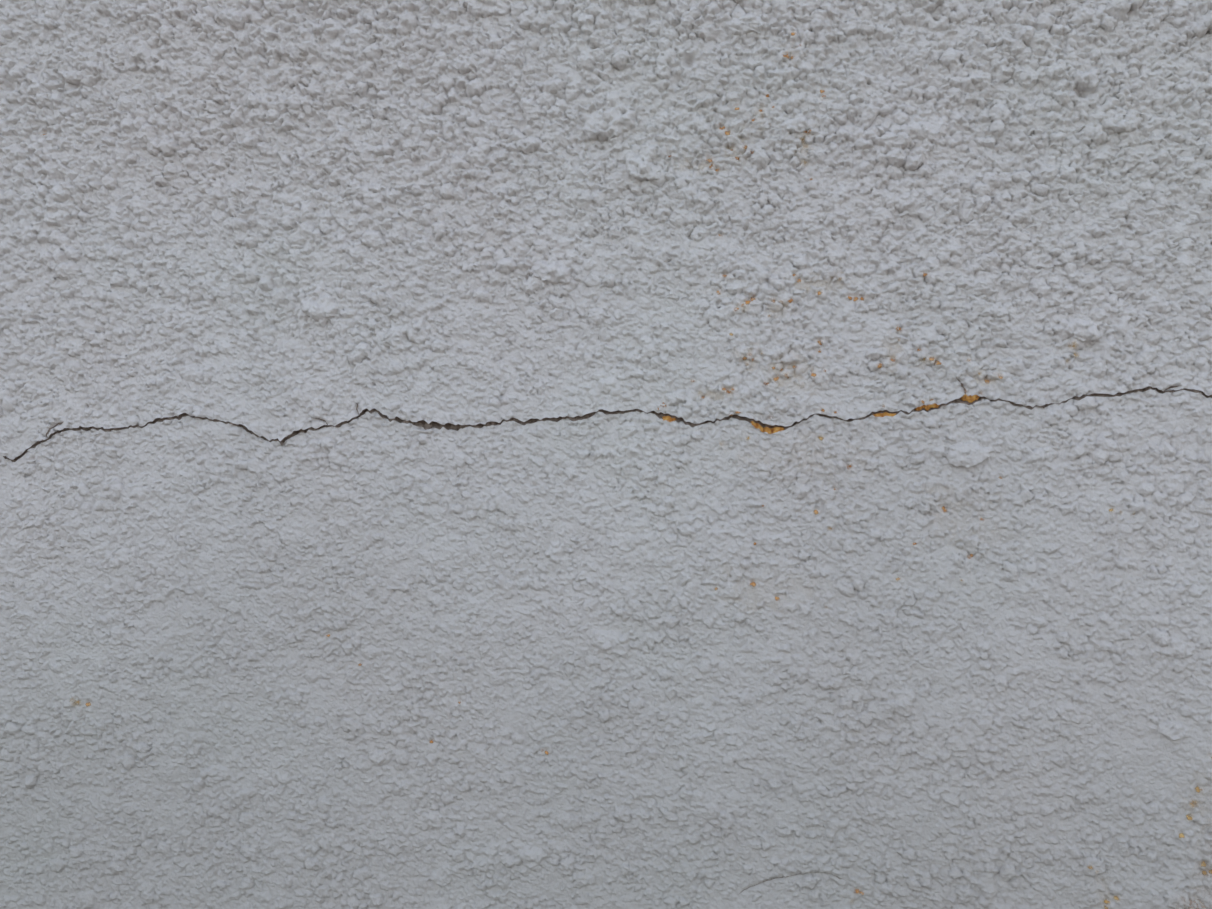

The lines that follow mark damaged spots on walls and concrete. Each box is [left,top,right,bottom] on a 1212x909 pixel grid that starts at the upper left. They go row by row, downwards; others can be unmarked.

crack [3,377,1212,462]
corrosion [735,411,785,439]